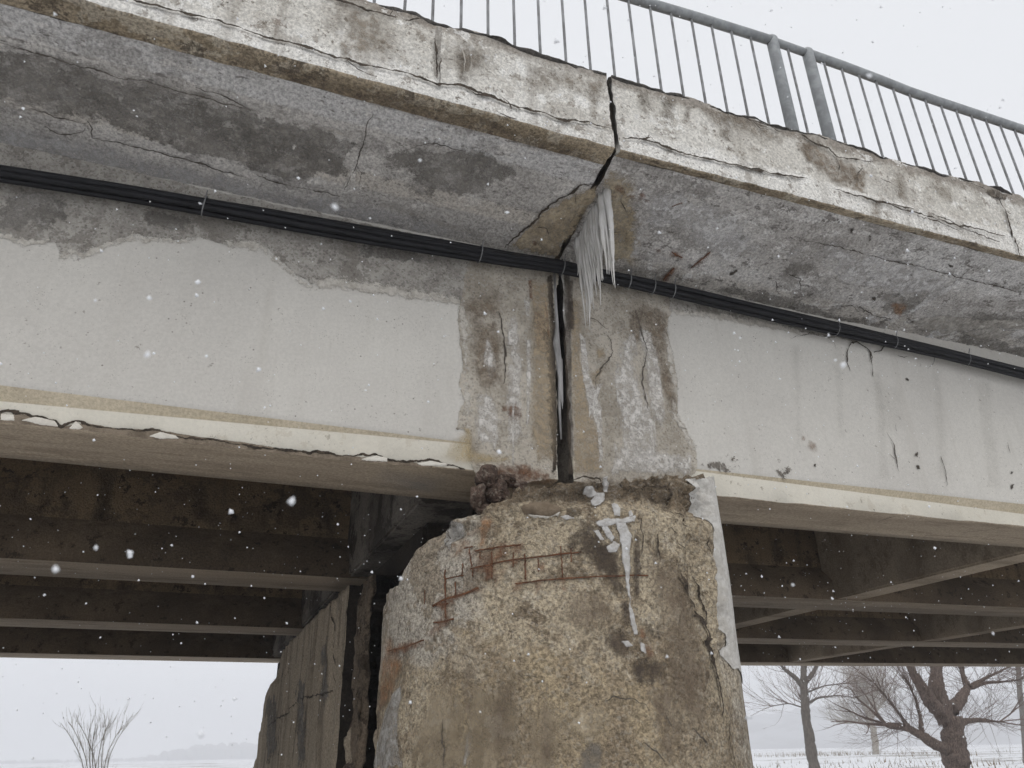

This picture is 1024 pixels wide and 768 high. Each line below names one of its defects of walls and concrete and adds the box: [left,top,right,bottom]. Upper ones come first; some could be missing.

crack [0,42,251,111]
crack [31,108,372,197]
flaking render [0,142,418,235]
damp [0,51,477,236]
damp [385,146,516,204]
crack [134,0,805,178]
crack [505,184,594,247]
crack [739,116,1022,262]
crack [499,313,512,384]
flaking render [0,172,875,684]
damp [568,522,642,655]
crack [569,475,736,765]